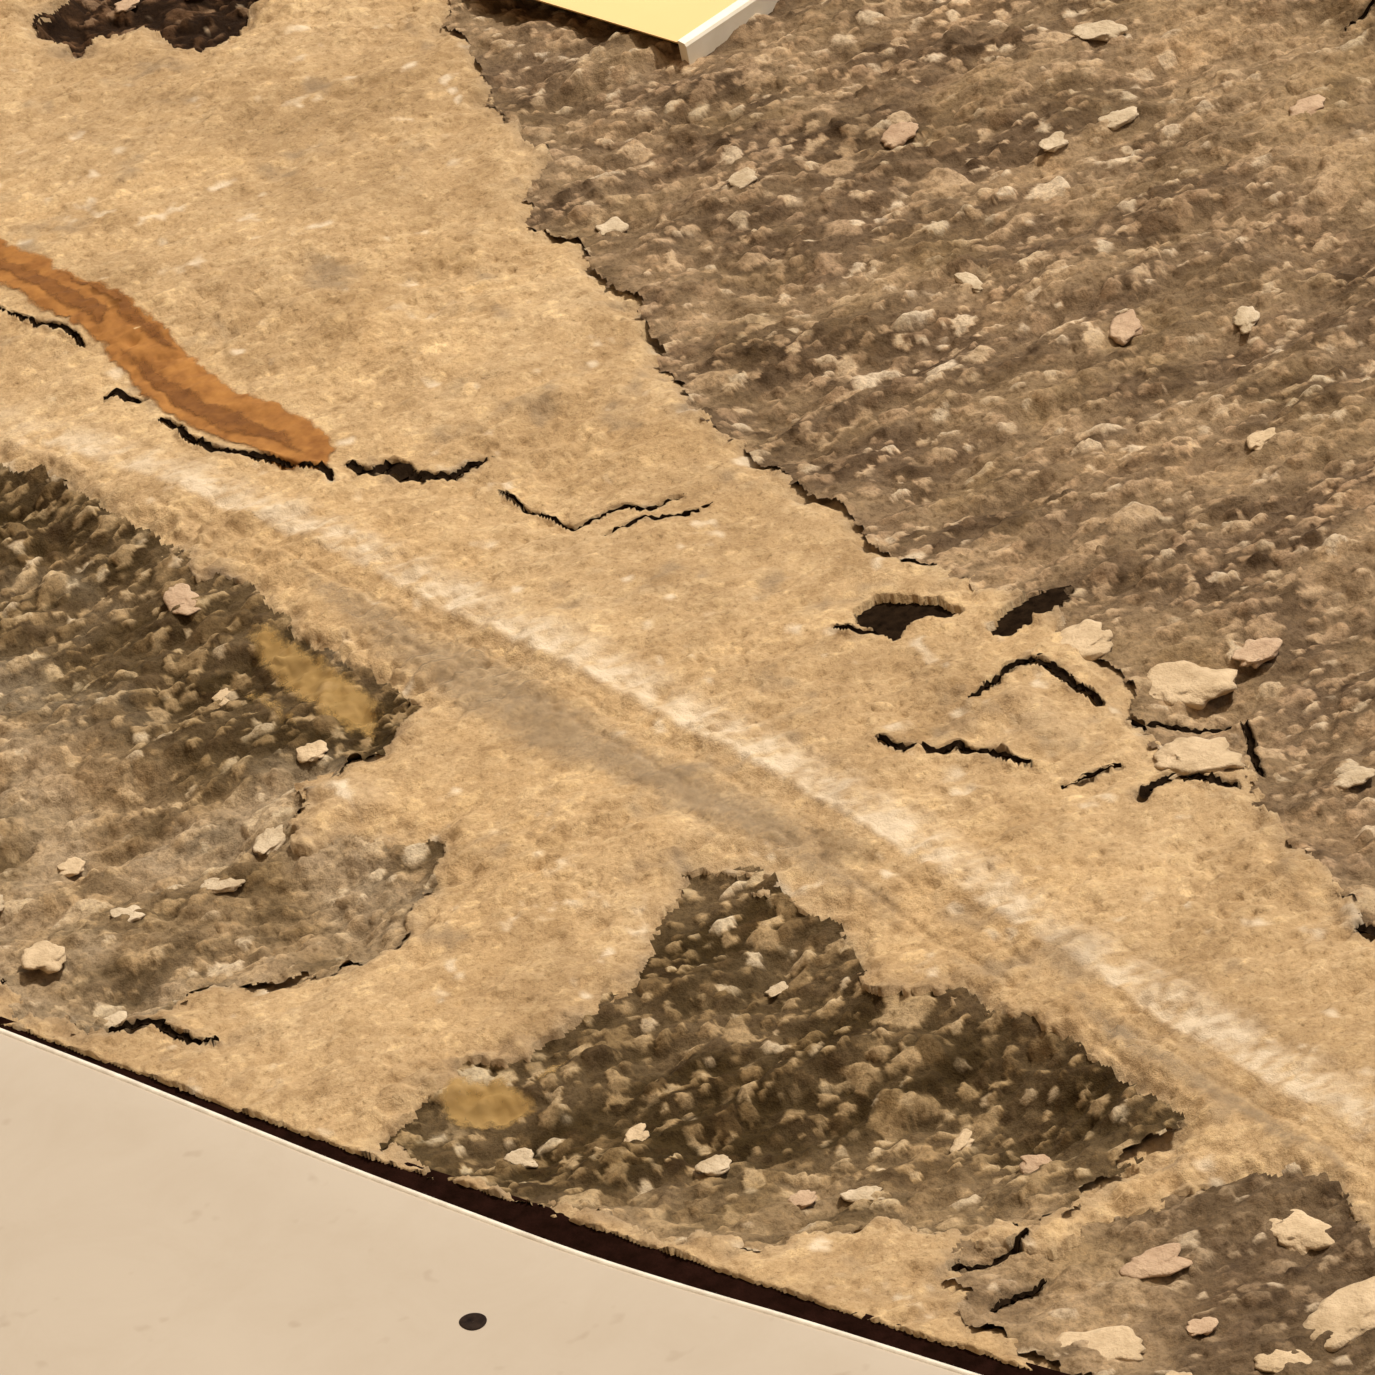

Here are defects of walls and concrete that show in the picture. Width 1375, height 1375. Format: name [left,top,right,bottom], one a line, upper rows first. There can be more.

flaking render [32,0,259,59]
crack [0,307,84,347]
rust [0,238,336,470]
crack [103,387,713,536]
flaking render [440,0,1375,927]
crack [833,624,878,635]
crack [968,653,1103,706]
flaking render [0,462,446,1035]
crack [877,734,1031,764]
crack [1061,719,1264,799]
crack [1355,923,1375,936]
flaking render [379,865,1375,1375]